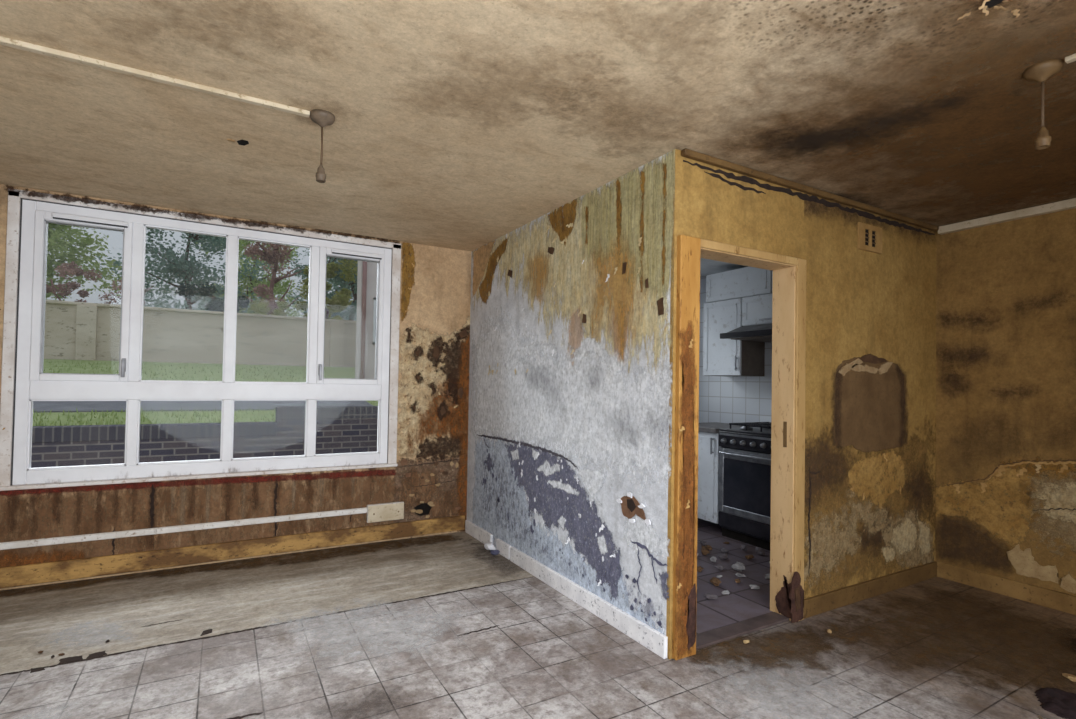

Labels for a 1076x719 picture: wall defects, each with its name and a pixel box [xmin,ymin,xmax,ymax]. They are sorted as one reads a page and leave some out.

spalling [958,0,1020,20]
water stain [724,0,1076,226]
crack [683,160,935,236]
peeling [393,149,697,658]
flaking render [832,354,908,509]
flaking render [881,456,1076,594]